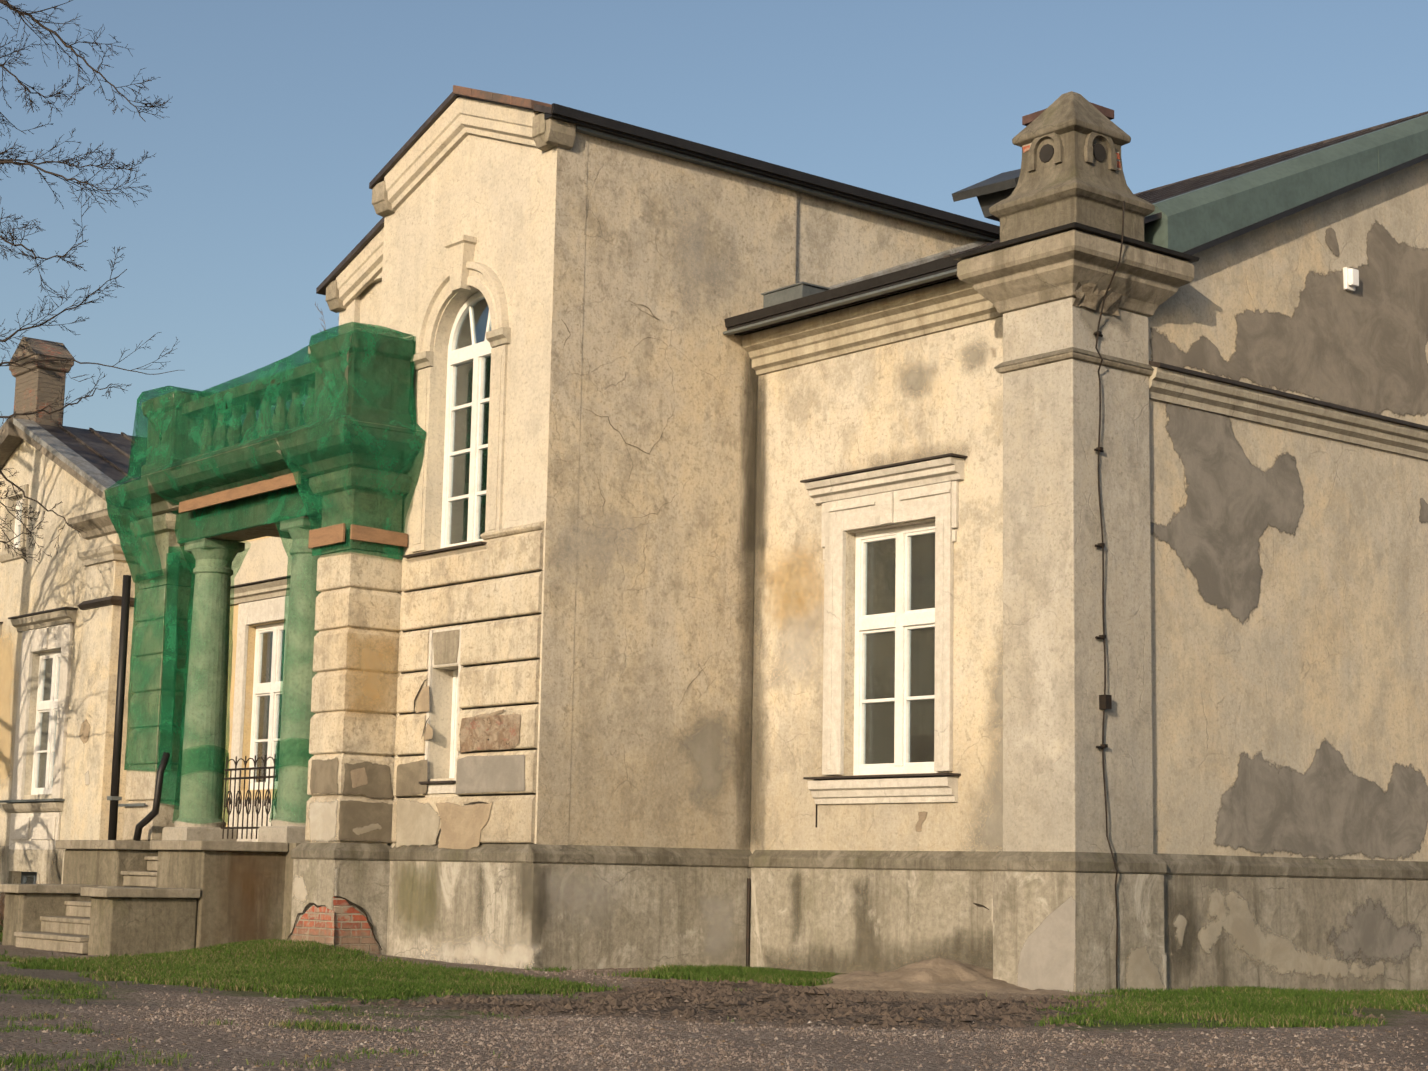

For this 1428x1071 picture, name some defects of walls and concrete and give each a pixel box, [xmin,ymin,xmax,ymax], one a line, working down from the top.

peeling [1325,228,1339,257]
leakage [682,362,762,840]
flaking render [287,896,382,954]
leakage [425,867,544,969]
leakage [778,887,993,974]
peeling [1126,889,1385,992]